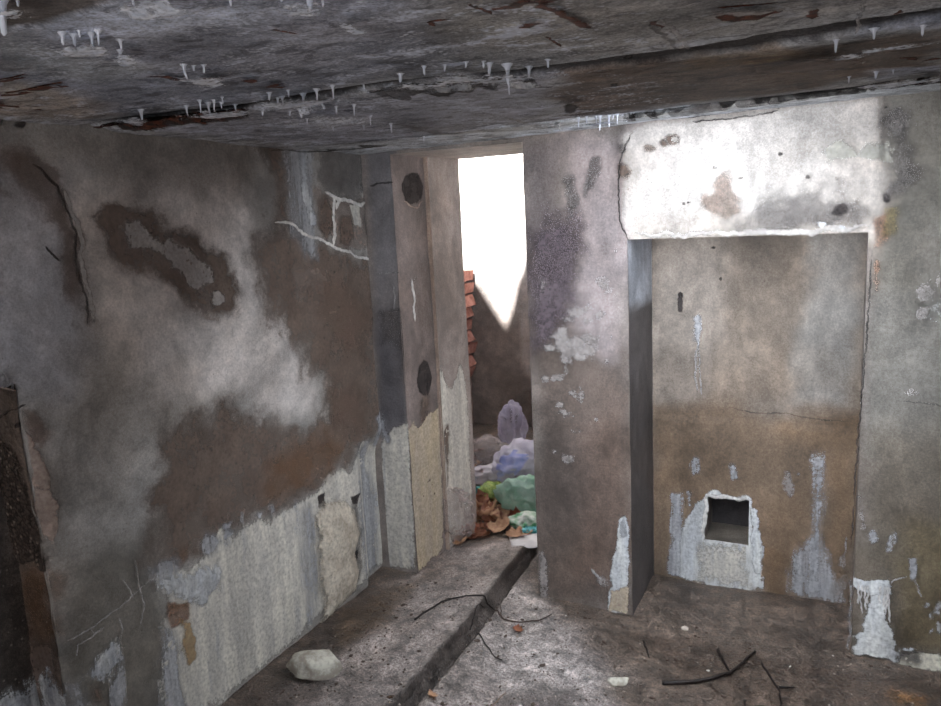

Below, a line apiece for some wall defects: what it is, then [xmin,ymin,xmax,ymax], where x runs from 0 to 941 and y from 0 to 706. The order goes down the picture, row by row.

efflorescence [0,0,22,36]
water stain [106,109,147,126]
efflorescence [179,64,377,131]
water stain [395,59,566,95]
crack [33,164,95,323]
water stain [94,202,239,318]
crack [275,182,417,320]
water stain [145,147,472,706]
spalling [167,603,196,665]